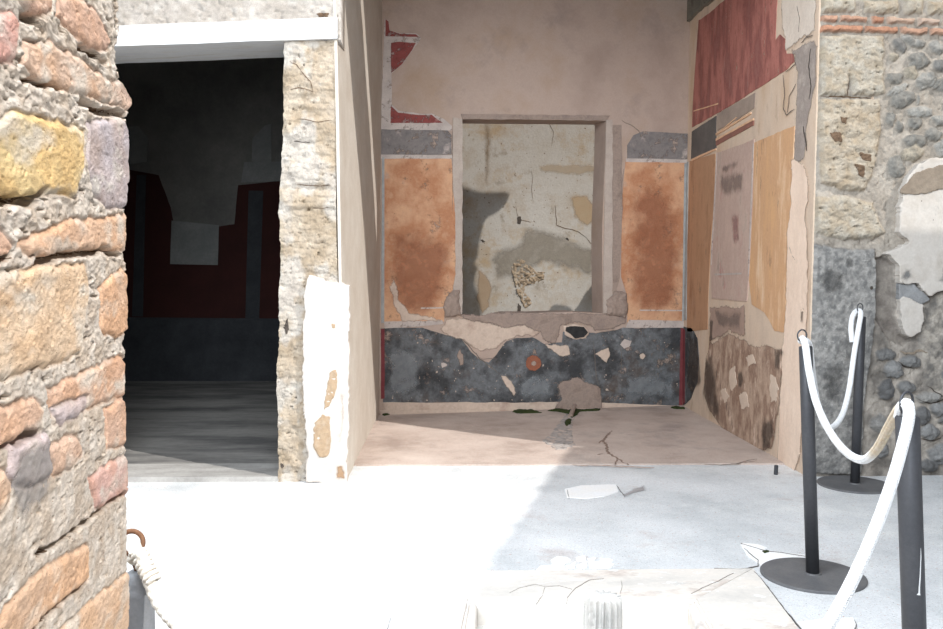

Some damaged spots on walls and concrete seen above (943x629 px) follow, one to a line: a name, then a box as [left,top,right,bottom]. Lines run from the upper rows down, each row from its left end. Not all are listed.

flaking render [781,0,816,161]
flaking render [900,165,943,195]
flaking render [390,230,628,343]
flaking render [895,283,930,304]
flaking render [596,348,610,362]
flaking render [704,306,782,450]
crack [543,414,654,497]
crack [510,578,622,604]